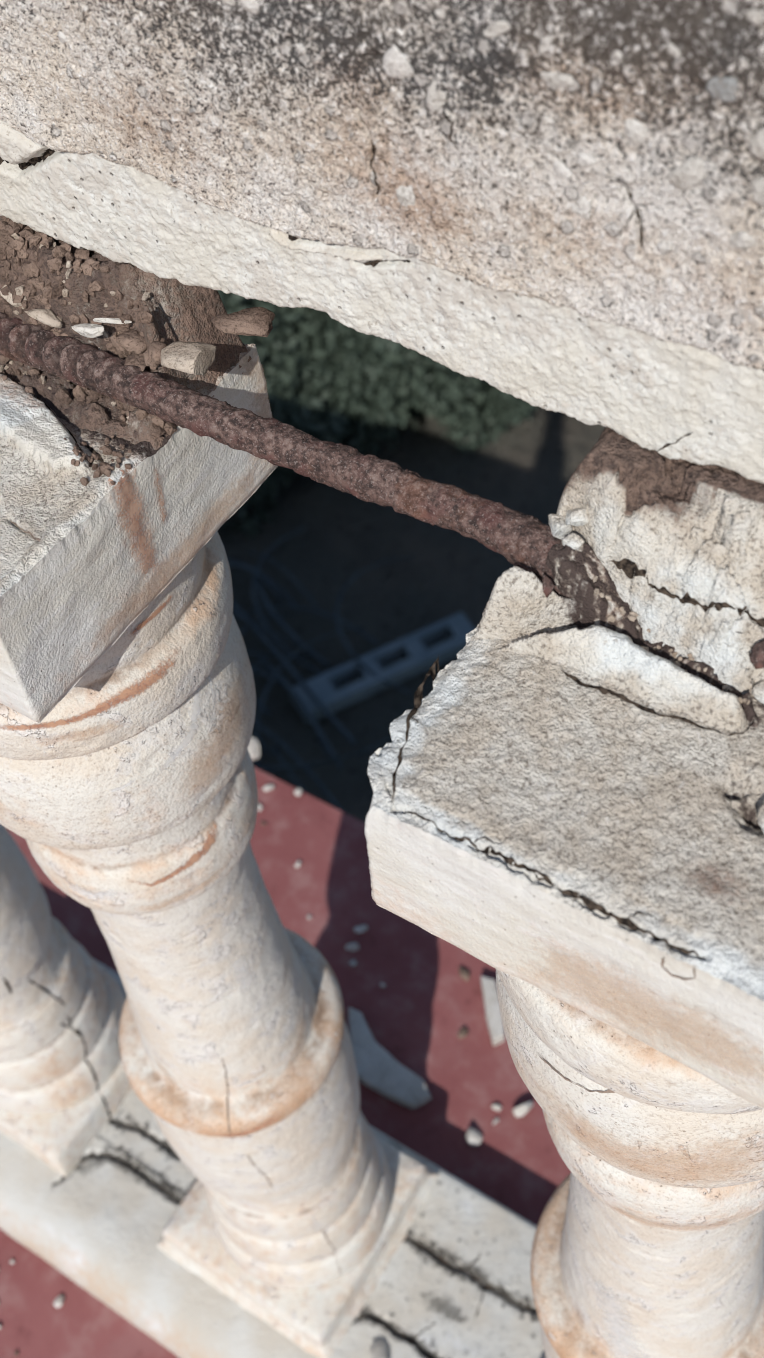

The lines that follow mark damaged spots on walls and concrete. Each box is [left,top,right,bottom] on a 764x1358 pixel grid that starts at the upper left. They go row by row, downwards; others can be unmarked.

crack [0,148,55,170]
crack [620,182,643,246]
crack [363,259,411,267]
spalling [0,236,252,398]
spalling [0,359,177,450]
rust [108,470,155,574]
rust [133,596,171,633]
spalling [471,427,764,733]
rust [3,656,174,731]
crack [562,670,755,736]
crack [391,655,705,959]
crack [3,978,180,1203]